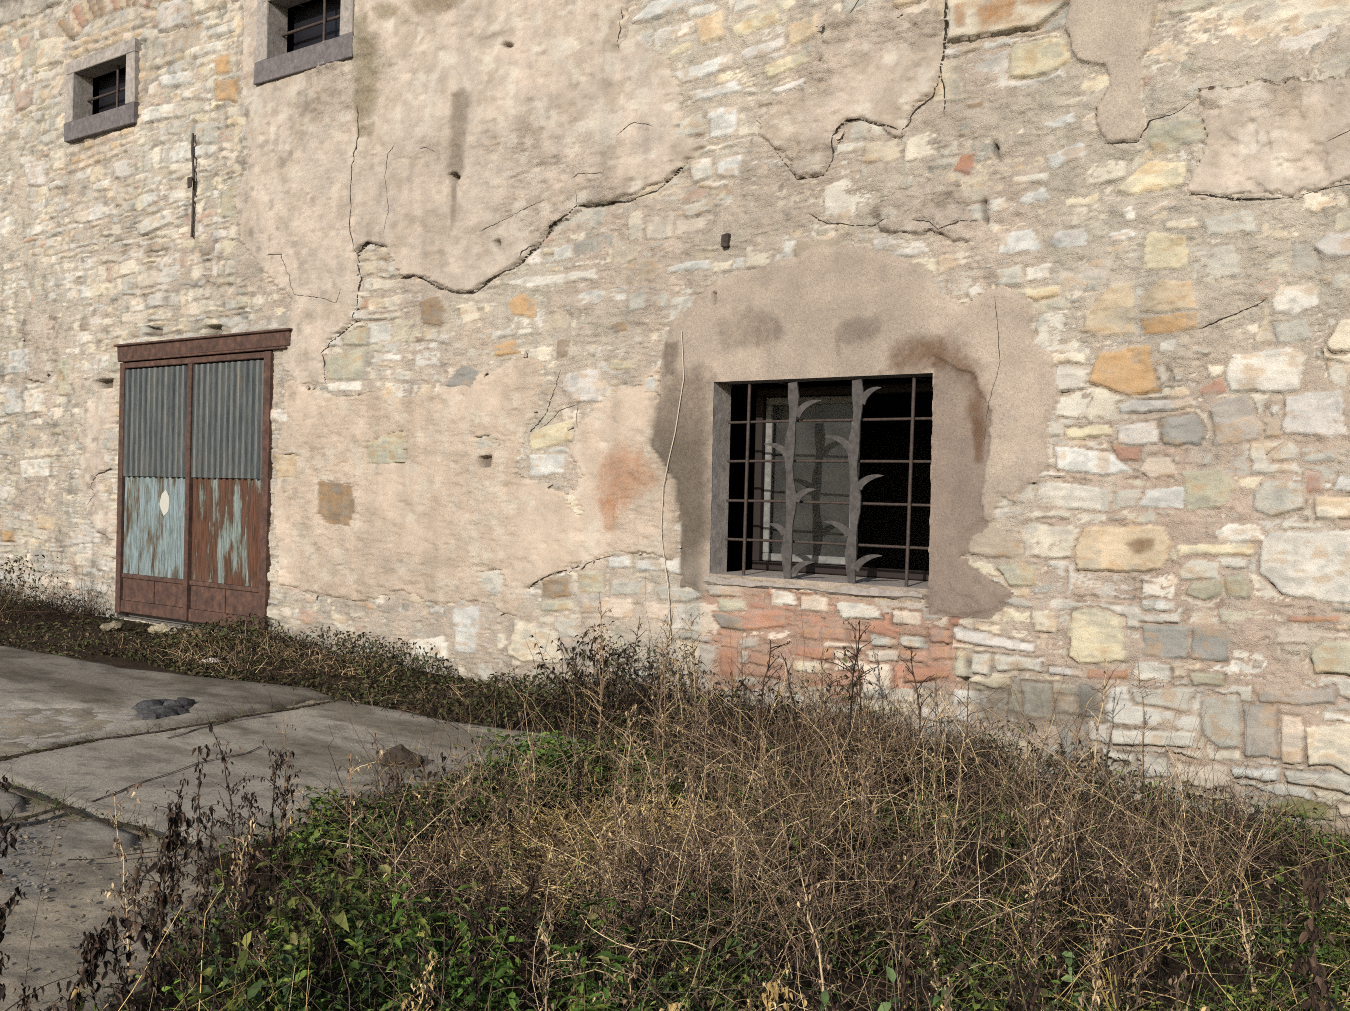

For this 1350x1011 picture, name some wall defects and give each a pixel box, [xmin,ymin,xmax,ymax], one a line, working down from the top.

spalling [0,0,292,629]
crack [268,106,435,383]
crack [400,163,688,294]
spalling [231,0,1350,857]
crack [776,0,949,180]
crack [811,214,976,229]